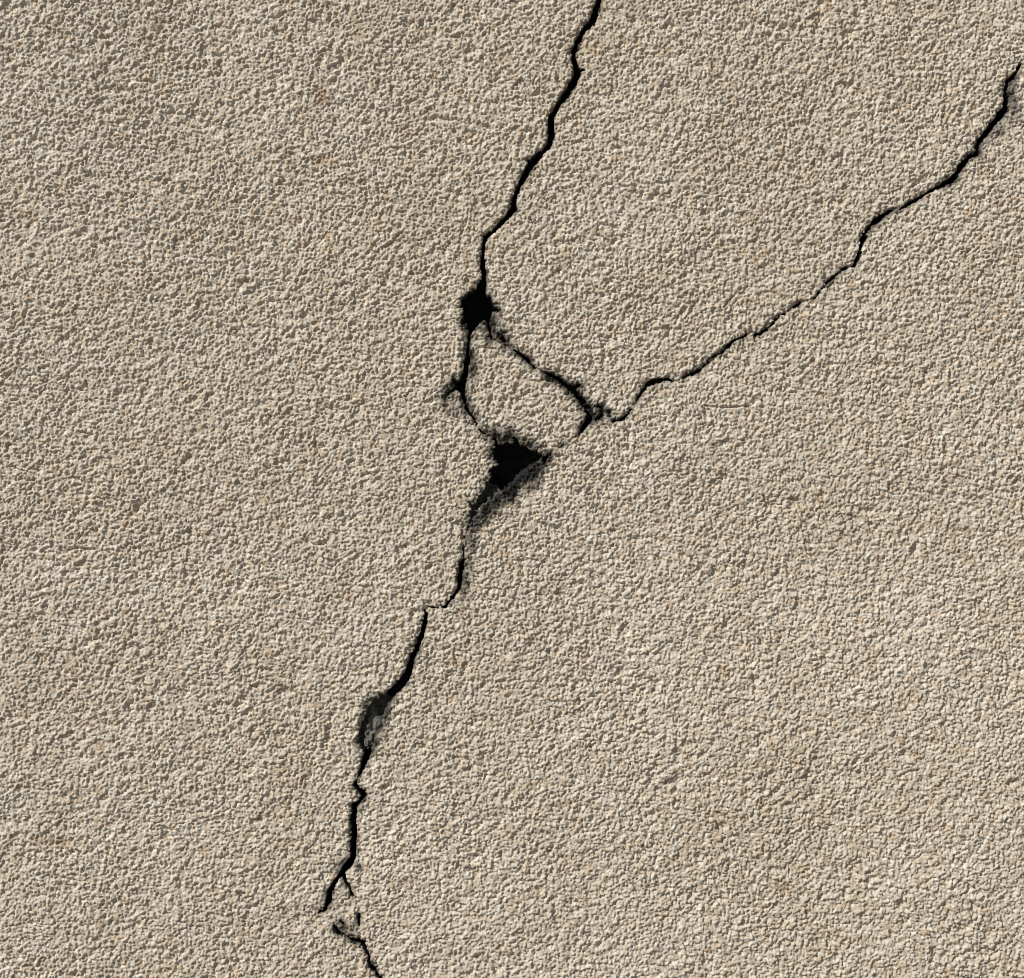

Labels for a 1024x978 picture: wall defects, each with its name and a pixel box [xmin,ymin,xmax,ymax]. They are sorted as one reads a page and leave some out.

crack [480,0,602,291]
crack [442,64,1022,463]
crack [389,517,473,690]
crack [319,750,382,978]